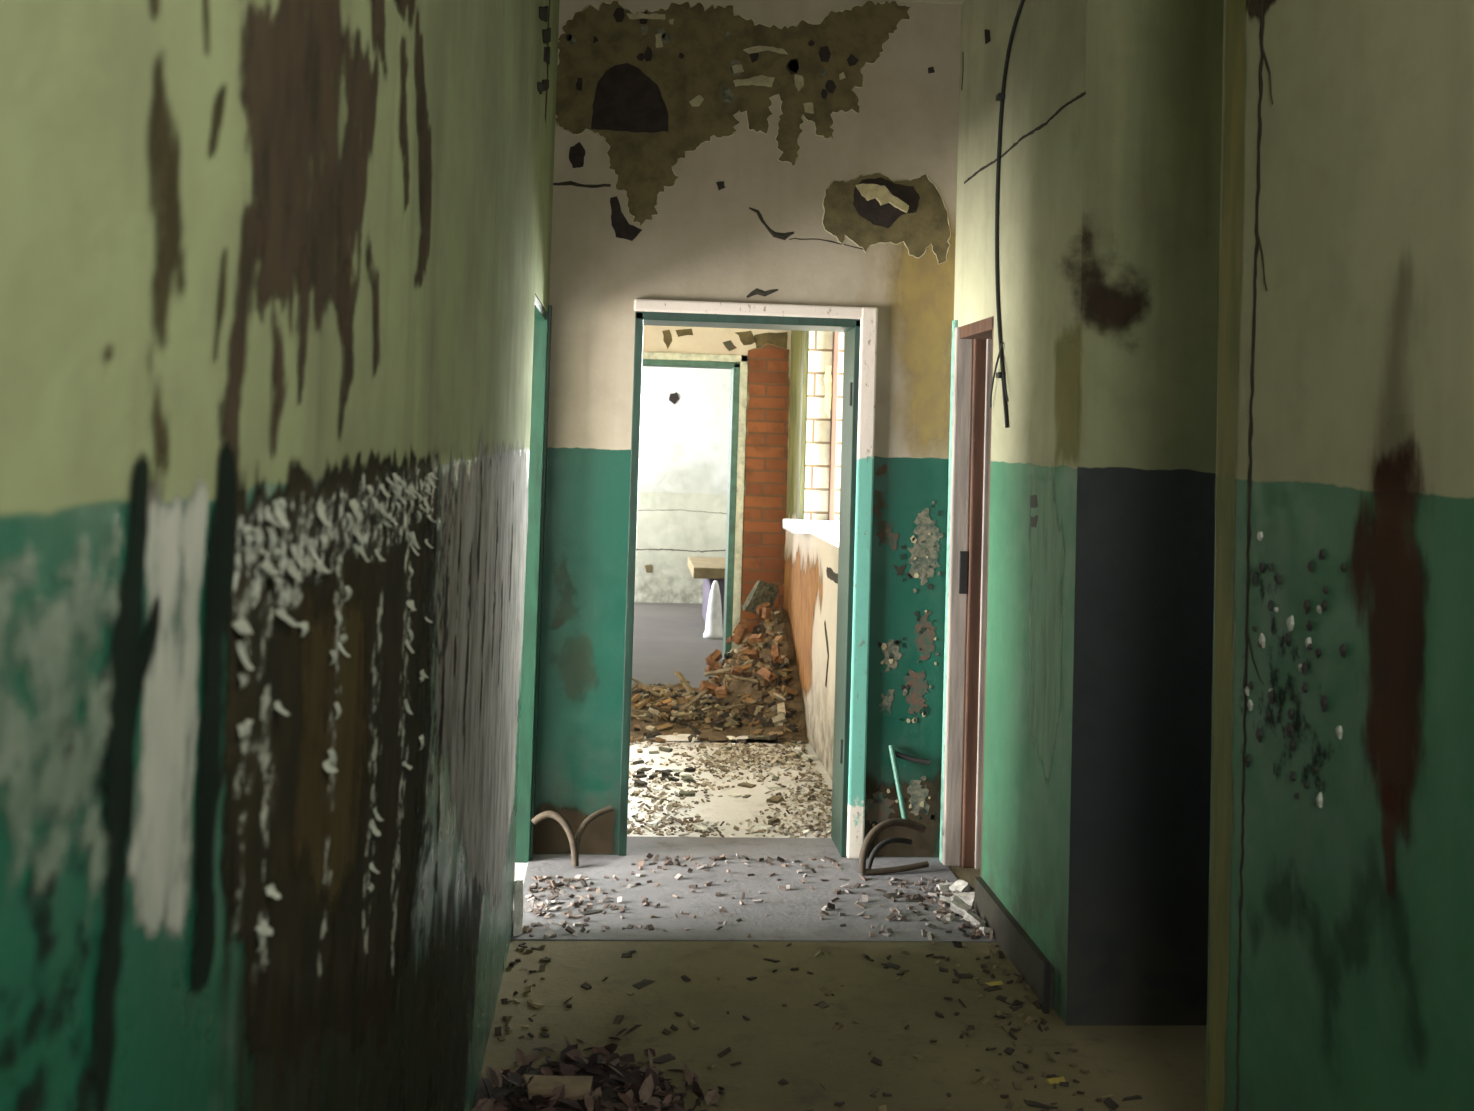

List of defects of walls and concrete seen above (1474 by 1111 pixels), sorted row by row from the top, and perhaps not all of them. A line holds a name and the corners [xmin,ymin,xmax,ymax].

water stain [149,56,186,360]
flaking render [537,0,911,241]
spalling [822,172,951,265]
water stain [192,0,433,995]
peeling [873,464,944,593]
peeling [220,434,528,1111]
peeling [865,776,934,827]
peeling [878,610,939,723]